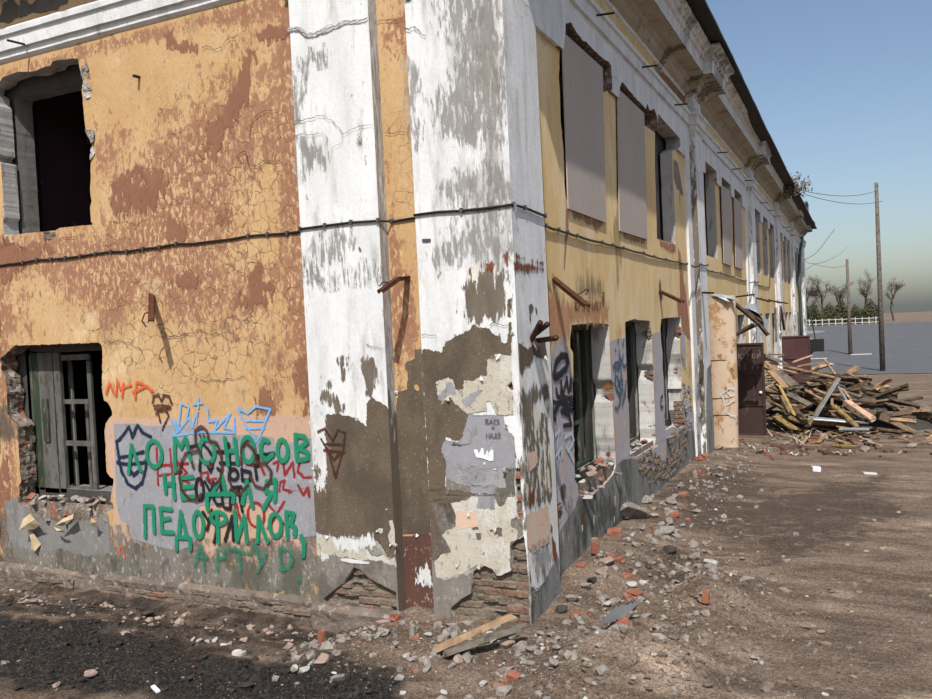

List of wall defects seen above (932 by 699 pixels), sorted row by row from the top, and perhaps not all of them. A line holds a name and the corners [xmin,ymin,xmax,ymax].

peeling [164,29,200,54]
crack [287,0,425,36]
spalling [81,61,92,99]
peeling [203,24,290,163]
peeling [287,45,330,185]
peeling [400,0,512,154]
spalling [85,130,95,160]
peeling [104,161,169,220]
peeling [230,261,277,312]
corrosion [486,250,544,276]
crack [165,328,261,384]
peeling [292,159,567,624]